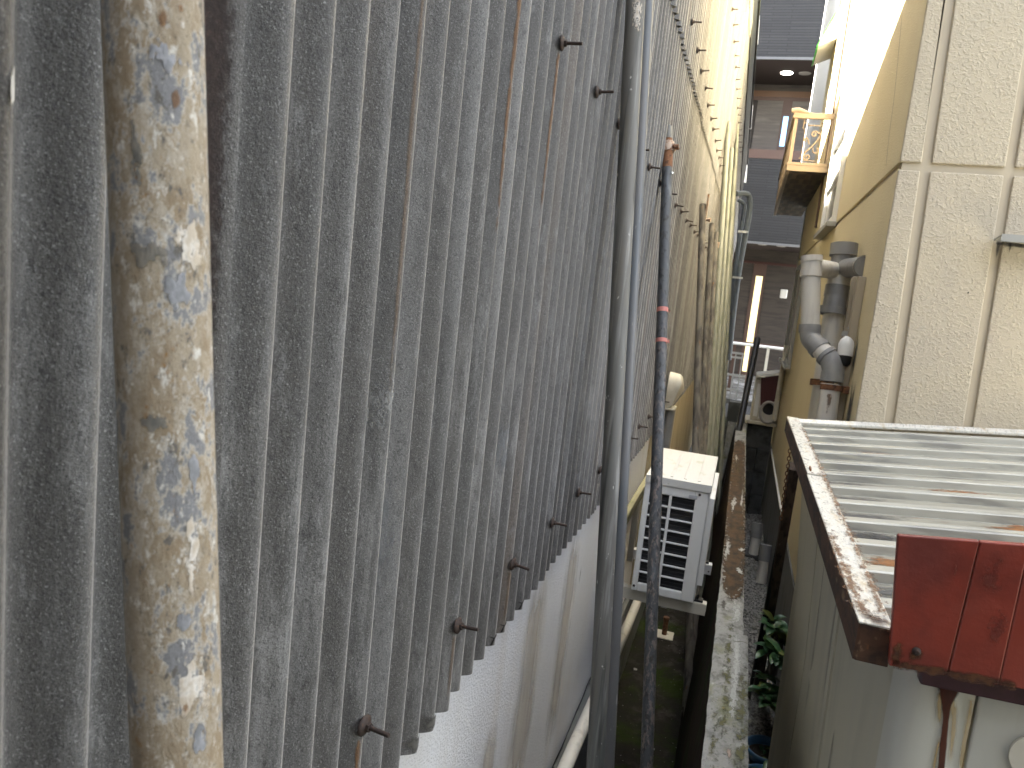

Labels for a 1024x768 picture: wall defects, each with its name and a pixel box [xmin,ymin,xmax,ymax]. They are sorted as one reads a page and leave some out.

peeling [148,34,189,74]
corrosion [499,0,521,206]
peeling [130,120,143,186]
peeling [129,219,203,311]
peeling [140,414,168,433]
corrosion [800,426,895,623]
corrosion [891,644,1016,768]